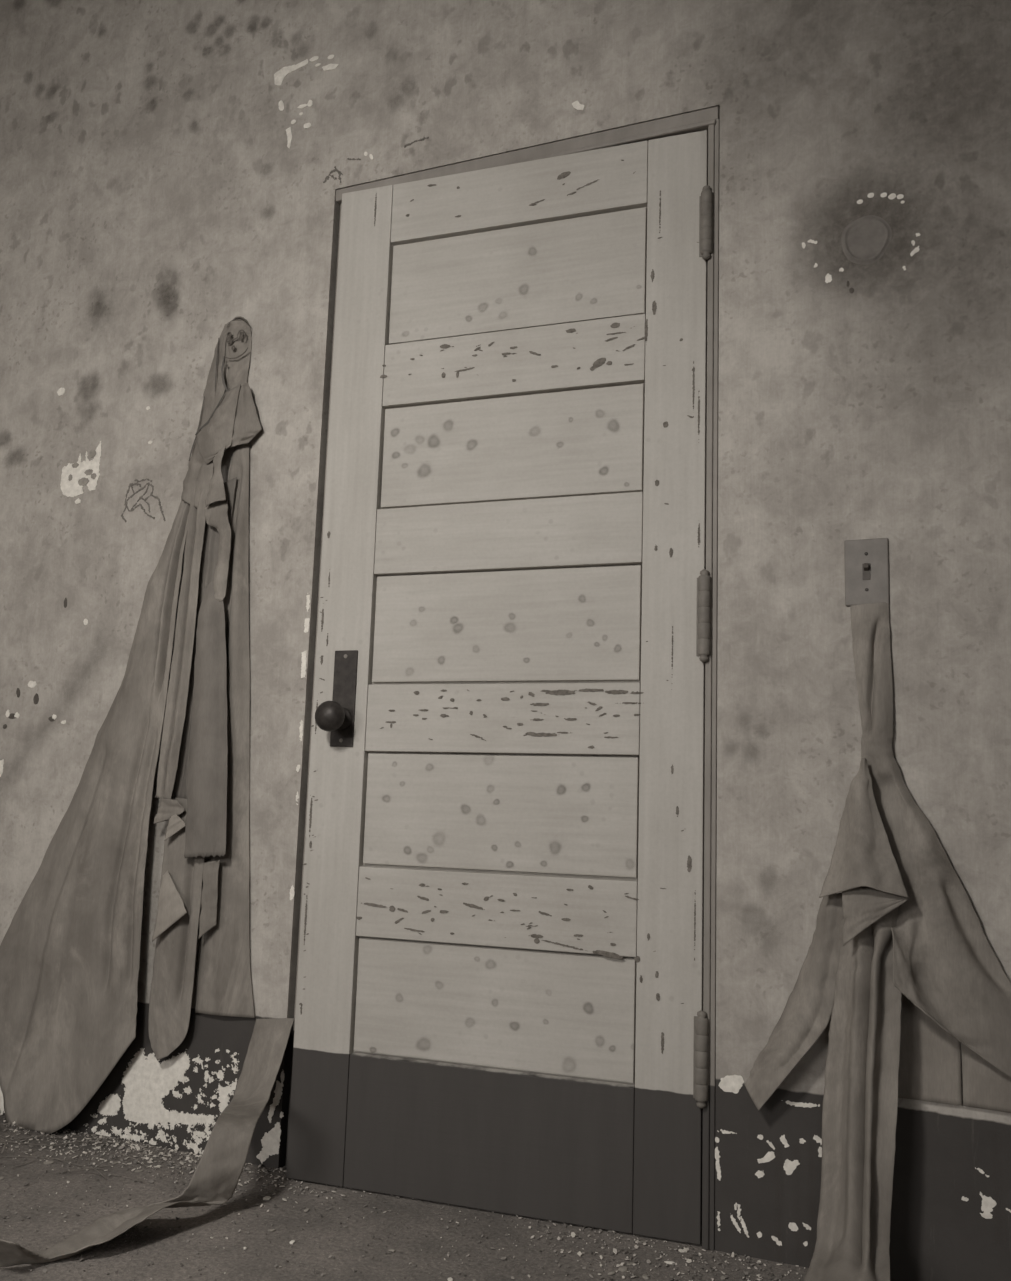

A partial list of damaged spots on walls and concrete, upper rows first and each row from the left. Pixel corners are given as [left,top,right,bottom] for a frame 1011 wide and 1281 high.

peeling [274,55,339,149]
peeling [60,441,101,504]
peeling [83,1048,240,1154]
peeling [256,1069,285,1163]
peeling [719,1075,744,1094]
peeling [782,1100,820,1108]
peeling [715,1129,737,1181]
peeling [755,1135,822,1178]
peeling [961,1167,1011,1219]
peeling [716,1203,811,1246]